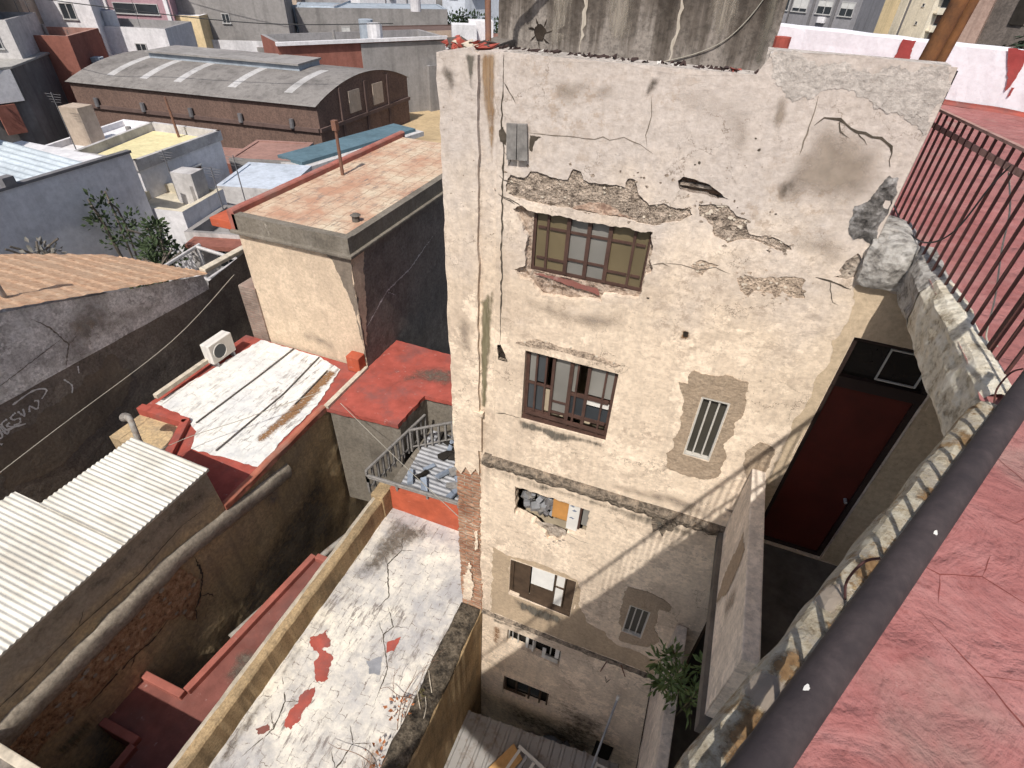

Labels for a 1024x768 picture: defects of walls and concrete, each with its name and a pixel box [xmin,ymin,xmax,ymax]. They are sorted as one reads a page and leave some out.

damp [579,0,588,52]
crack [669,0,684,63]
corrosion [483,55,494,146]
crack [799,99,893,166]
spalling [494,163,794,299]
peeling [736,269,814,304]
crack [0,505,210,707]
crack [195,558,213,622]
peeling [462,563,474,600]
peeling [490,548,661,675]
spalling [10,568,201,761]
peeling [284,629,333,730]